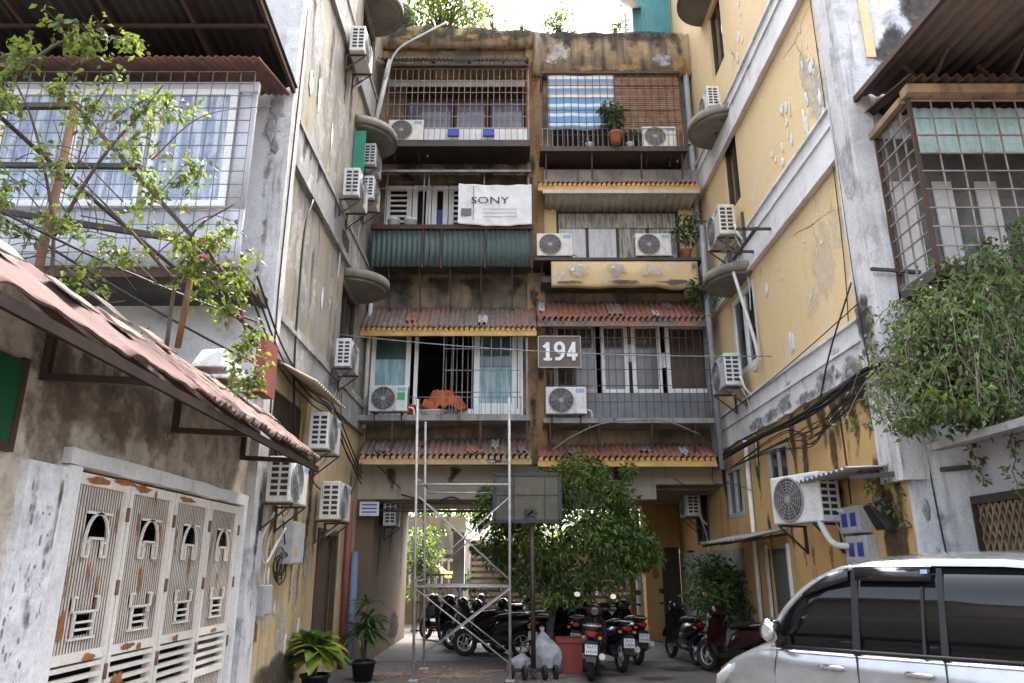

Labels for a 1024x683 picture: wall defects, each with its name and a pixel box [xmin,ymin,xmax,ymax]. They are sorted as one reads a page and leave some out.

peeling [546,43,570,63]
spalling [651,55,670,67]
mould [875,0,934,66]
peeling [771,25,825,168]
peeling [557,262,587,281]
water stain [749,352,873,508]
rust [88,476,158,506]
water stain [873,459,909,556]
rust [56,568,69,642]
rust [110,671,123,683]